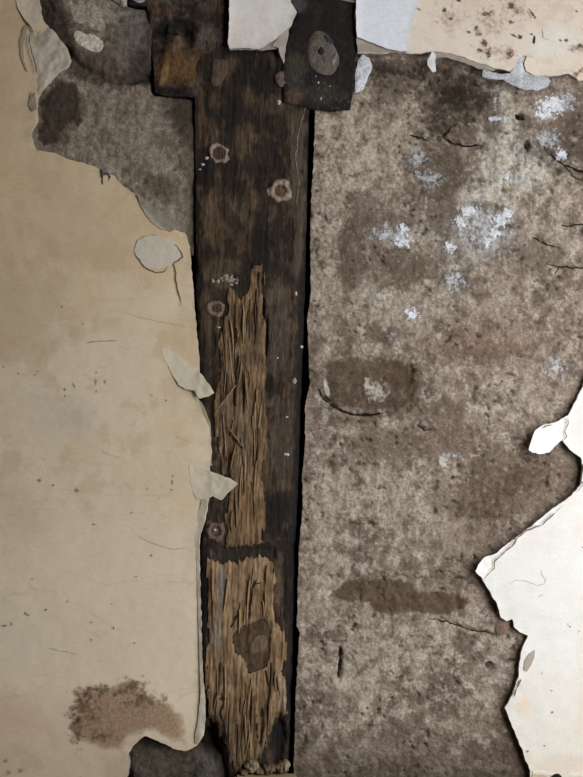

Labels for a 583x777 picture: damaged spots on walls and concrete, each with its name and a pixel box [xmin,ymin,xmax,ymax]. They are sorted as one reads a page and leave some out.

spalling [31,0,195,301]
crack [411,126,480,147]
efflorescence [534,93,575,161]
crack [543,146,583,181]
efflorescence [369,222,413,248]
efflorescence [442,198,513,254]
crack [319,389,385,416]
spalling [289,52,583,777]
leakage [331,579,467,616]
crack [430,618,496,635]
leakage [70,680,182,746]
spalling [127,705,228,777]